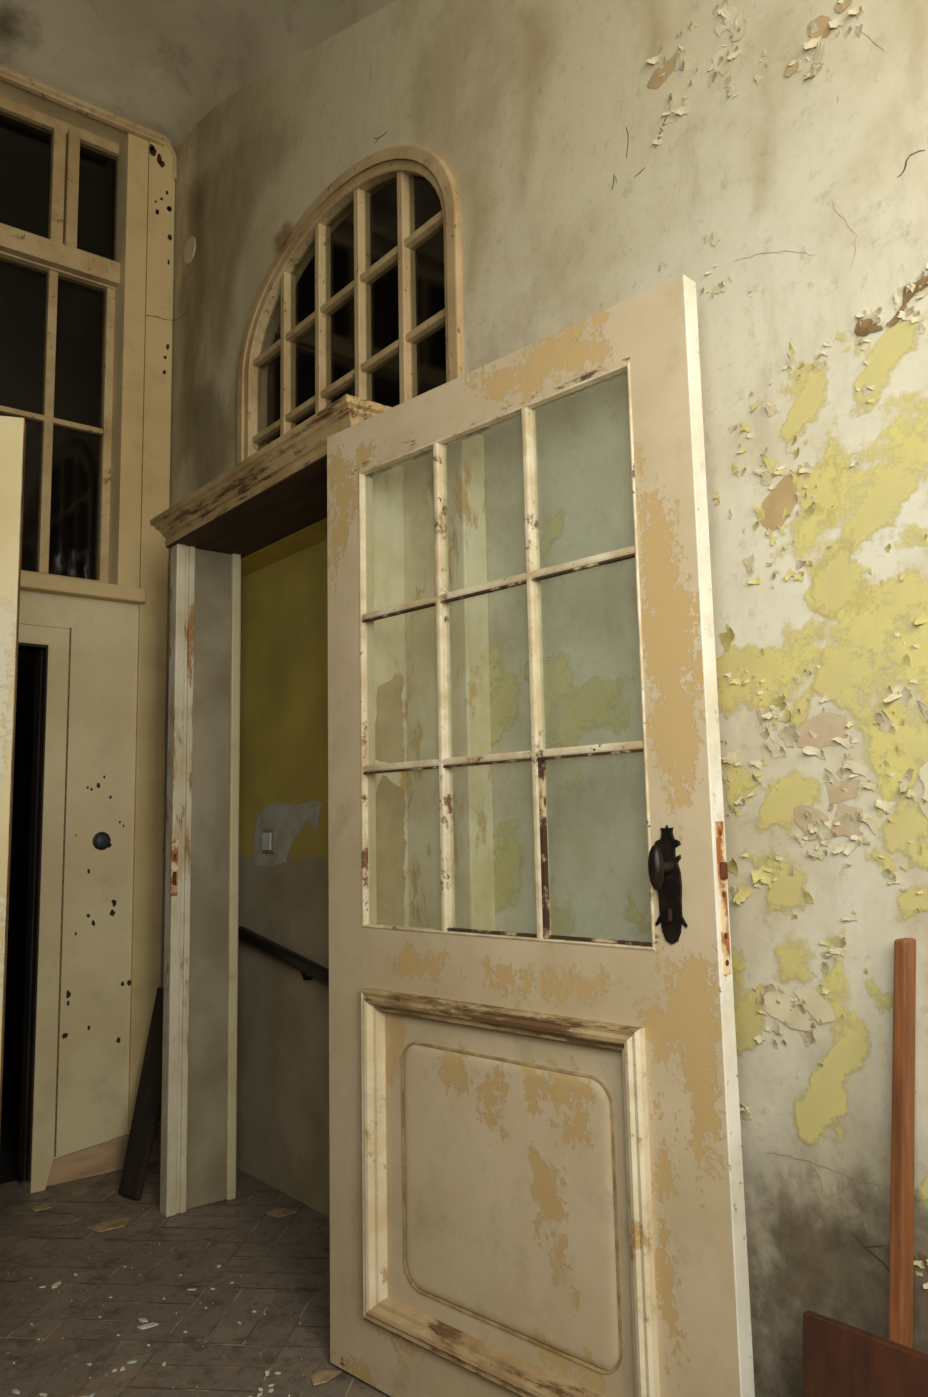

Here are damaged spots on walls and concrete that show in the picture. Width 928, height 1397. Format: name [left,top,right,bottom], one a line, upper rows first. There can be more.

peeling [645,0,747,145]
peeling [784,0,864,79]
peeling [699,265,733,298]
peeling [714,263,928,920]
peeling [731,910,871,1144]
spalling [914,1252,928,1289]